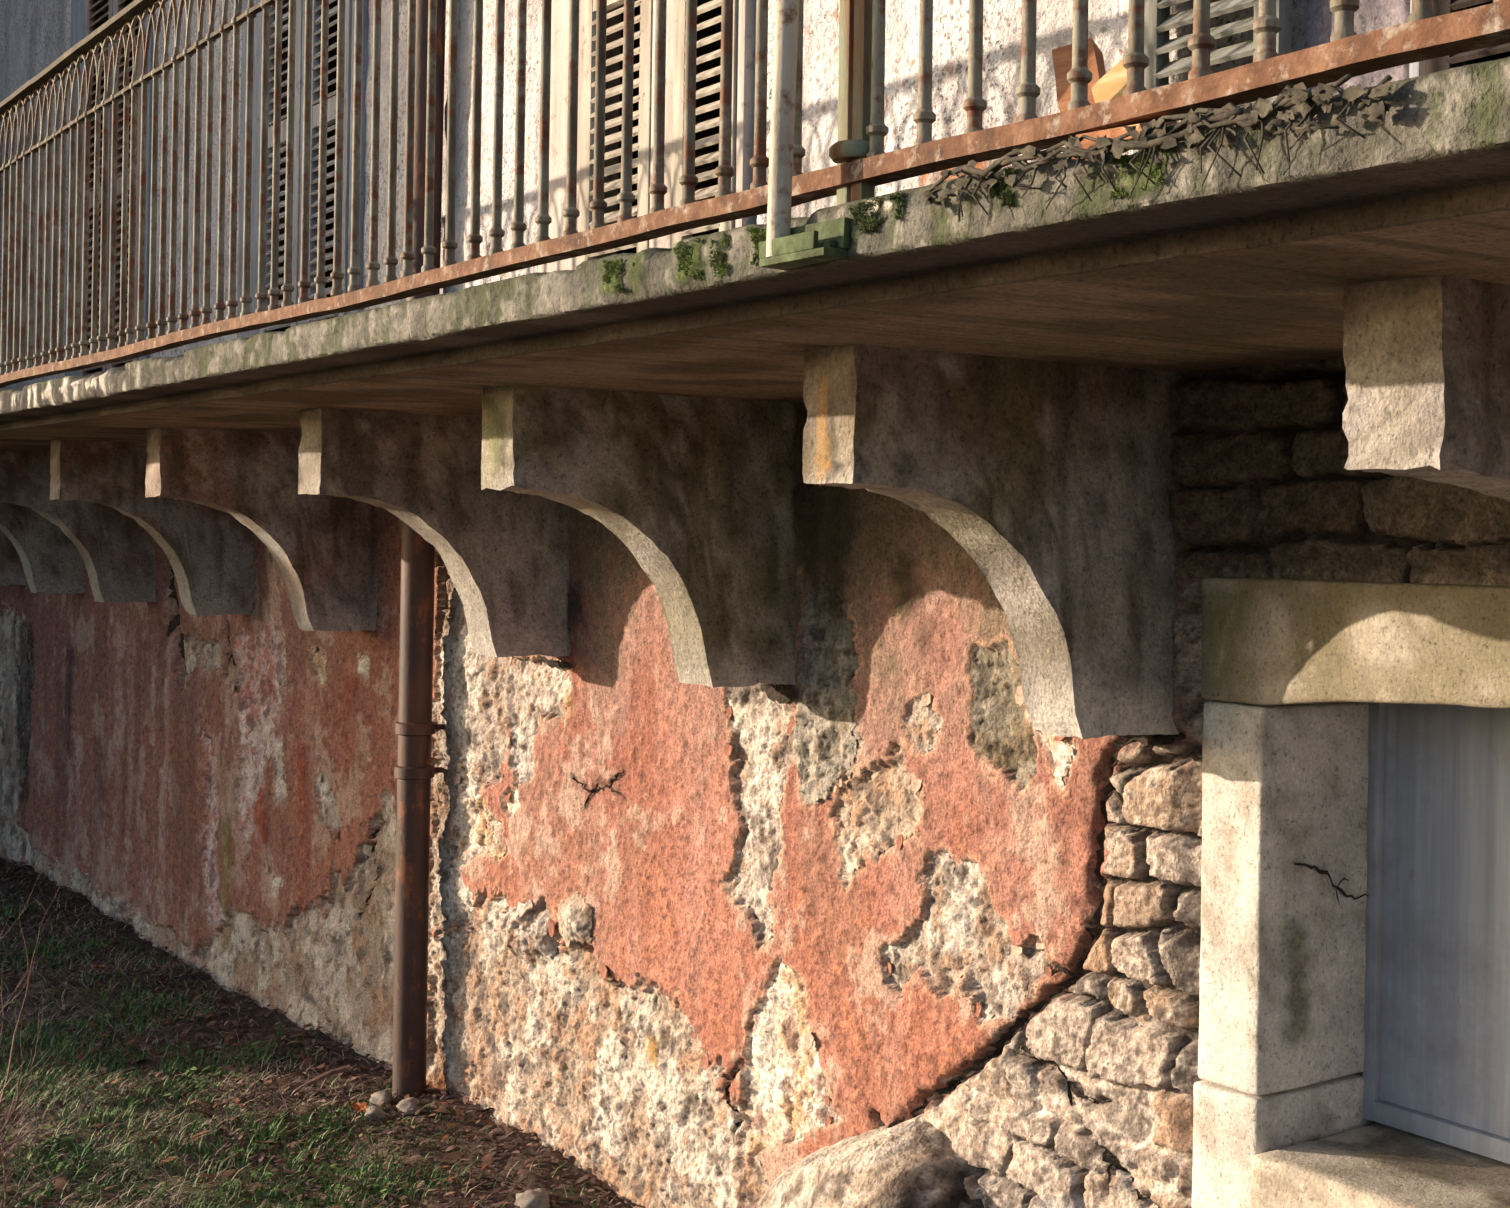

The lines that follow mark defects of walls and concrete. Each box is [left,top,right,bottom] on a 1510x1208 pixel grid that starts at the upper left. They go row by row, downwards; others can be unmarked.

corrosion [923,162,985,182]
peeling [0,606,396,1070]
crack [572,770,625,807]
peeling [427,563,841,1208]
peeling [721,582,943,945]
peeling [883,852,1053,1019]
peeling [969,644,1073,788]
crack [877,733,1185,1129]
crack [1294,863,1369,906]
crack [1094,1141,1161,1208]